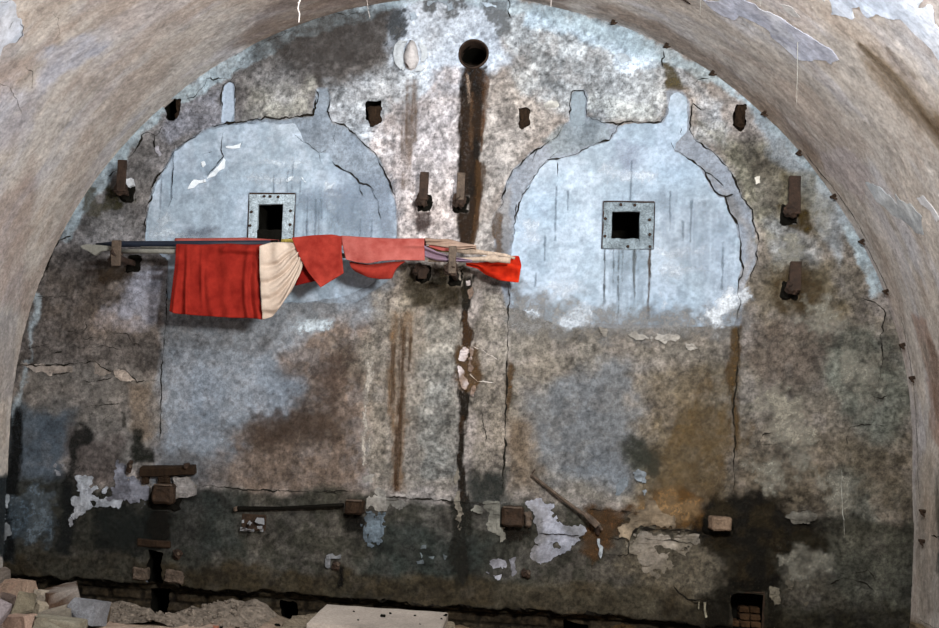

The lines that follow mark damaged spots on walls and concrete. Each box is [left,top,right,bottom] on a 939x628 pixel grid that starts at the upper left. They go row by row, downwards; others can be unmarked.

peeling [822,0,939,61]
crack [109,31,396,234]
rust [457,64,489,244]
rust [492,213,503,253]
crack [498,78,783,489]
damp [250,354,348,446]
rust [388,264,483,501]
crack [385,284,510,505]
damp [756,387,816,448]
peeling [68,475,123,527]
peeling [525,498,587,564]
damp [690,462,831,628]